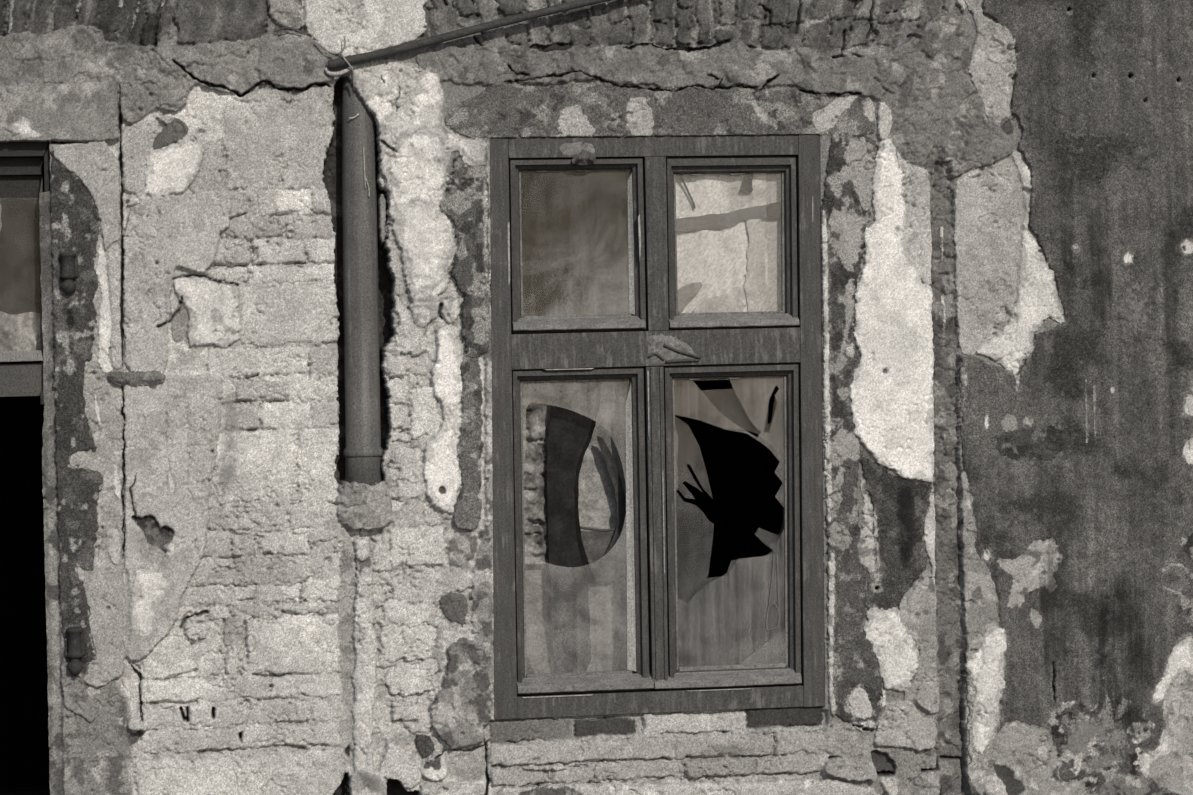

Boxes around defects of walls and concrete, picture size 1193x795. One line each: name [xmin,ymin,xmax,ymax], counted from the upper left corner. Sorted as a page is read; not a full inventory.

crack [173,60,331,97]
crack [504,41,862,96]
damp [1042,44,1182,159]
peeling [126,118,204,206]
peeling [171,276,240,348]
spalling [953,151,1065,391]
damp [1094,270,1152,339]
damp [1085,379,1097,443]
spalling [132,515,174,556]
flaking render [959,470,1193,795]
crack [131,665,143,720]
spalling [333,773,349,795]